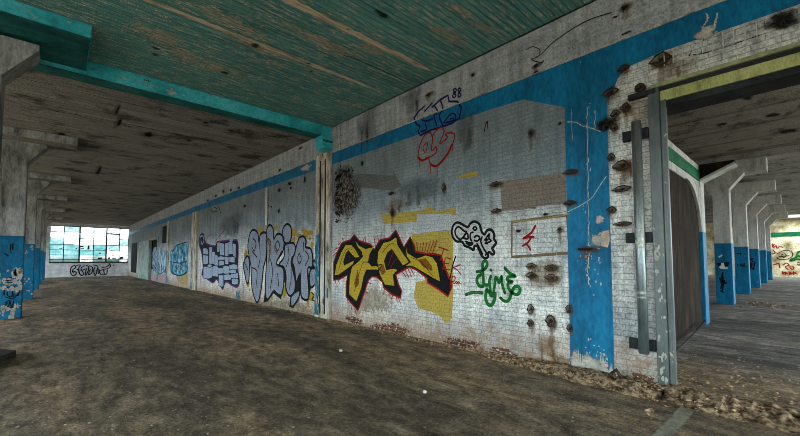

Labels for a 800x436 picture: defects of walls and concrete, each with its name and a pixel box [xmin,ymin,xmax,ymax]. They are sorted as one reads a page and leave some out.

peeling [694,25,717,42]
crack [568,107,601,285]
peeling [578,215,610,295]
peeling [0,267,33,295]
peeling [654,245,666,303]
peeling [0,303,21,319]
peeling [569,338,613,373]